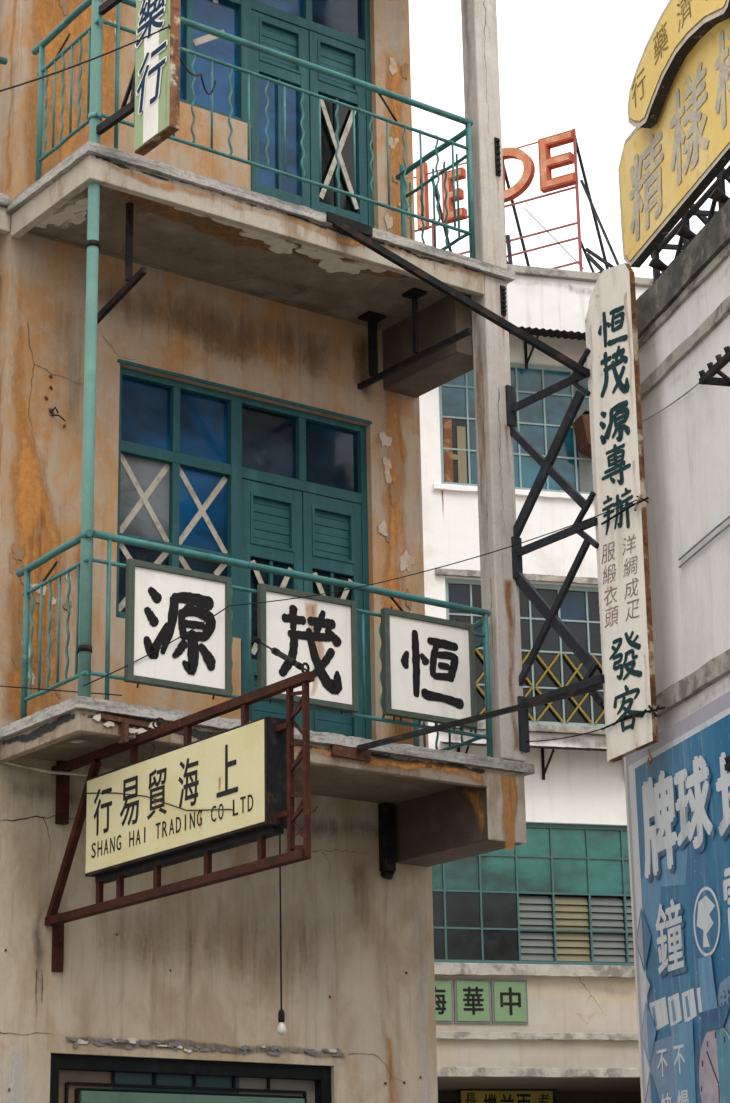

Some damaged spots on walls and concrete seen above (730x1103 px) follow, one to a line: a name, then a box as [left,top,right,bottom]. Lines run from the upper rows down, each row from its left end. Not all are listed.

peeling [389,57,409,80]
peeling [123,193,405,278]
peeling [384,202,413,230]
crack [27,323,81,444]
peeling [378,431,398,505]
peeling [377,520,391,543]
peeling [400,550,415,571]
rust [502,776,517,849]
crack [0,815,75,864]
peeling [67,1036,343,1058]